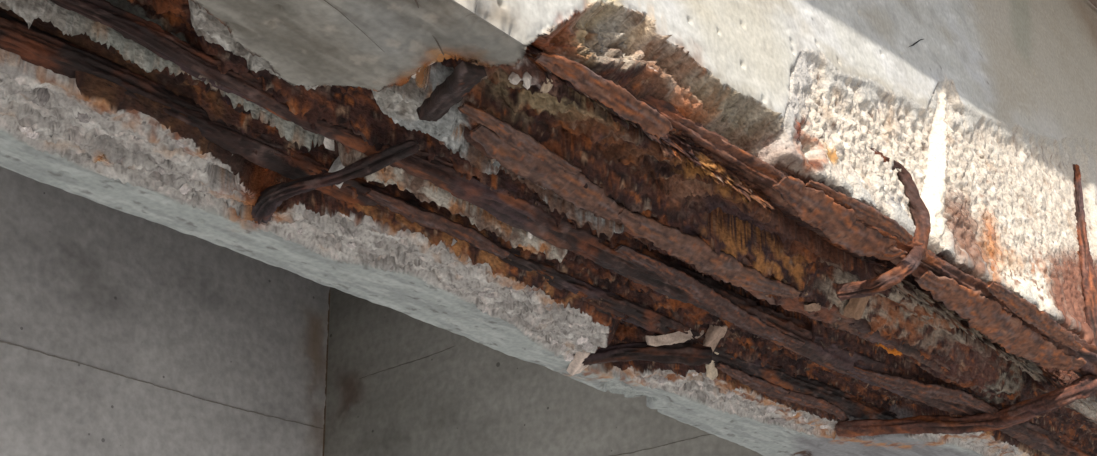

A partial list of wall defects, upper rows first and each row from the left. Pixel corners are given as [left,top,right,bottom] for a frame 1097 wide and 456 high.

rust [534,52,673,140]
spalling [536,0,785,153]
spalling [0,48,961,439]
rust [458,103,805,348]
rust [808,149,838,168]
rust [772,176,913,261]
spalling [764,48,1097,324]
rust [947,203,979,269]
rust [914,257,1094,379]
rust [845,366,1000,415]
spalling [846,430,1051,456]
spalling [1019,394,1097,456]